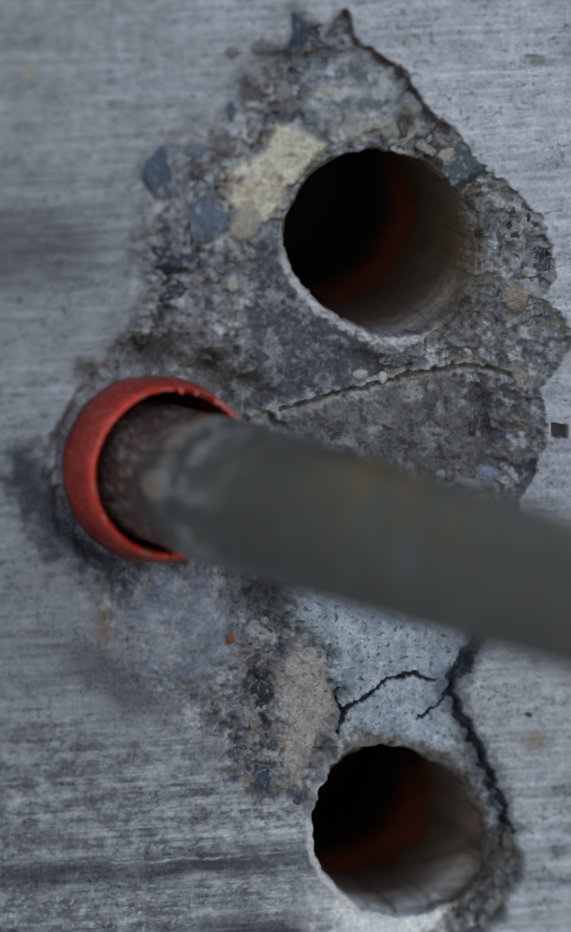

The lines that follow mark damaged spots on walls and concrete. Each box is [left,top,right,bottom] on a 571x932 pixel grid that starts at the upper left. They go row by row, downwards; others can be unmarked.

spalling [33,0,571,520]
crack [278,362,514,412]
spalling [57,520,528,932]
crack [334,644,516,835]